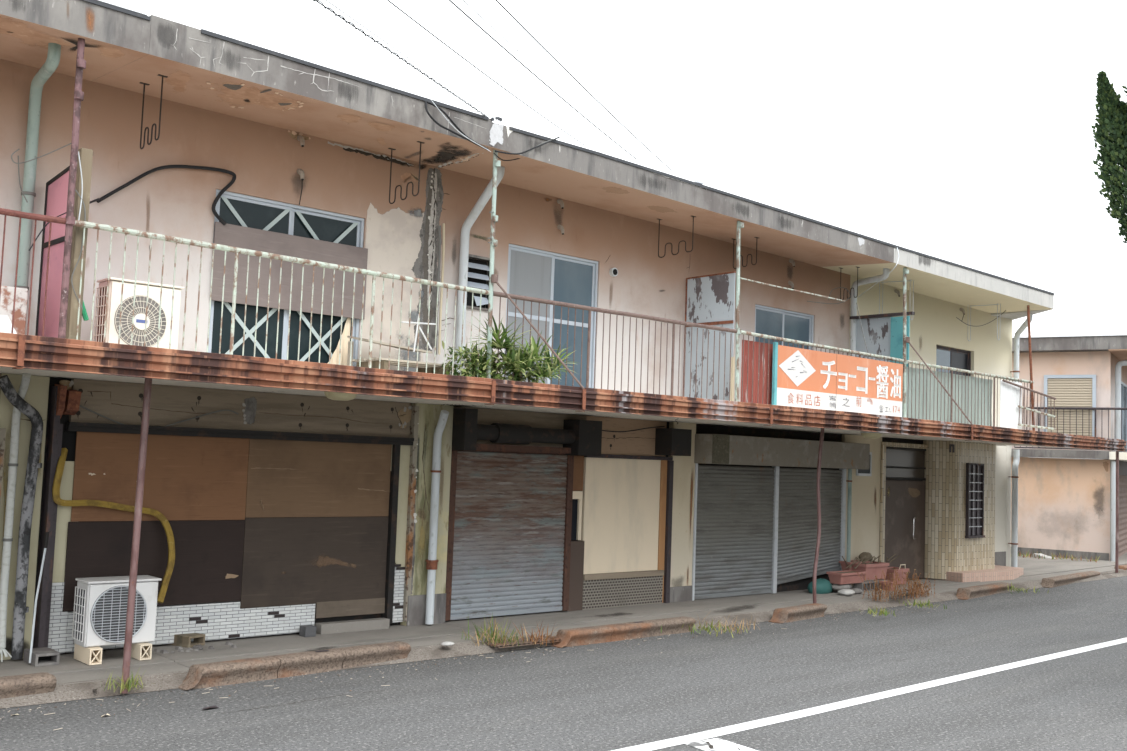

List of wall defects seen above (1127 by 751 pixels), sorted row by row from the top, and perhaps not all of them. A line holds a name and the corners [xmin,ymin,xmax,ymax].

water stain [381,143,470,169]
peeling [361,168,444,372]